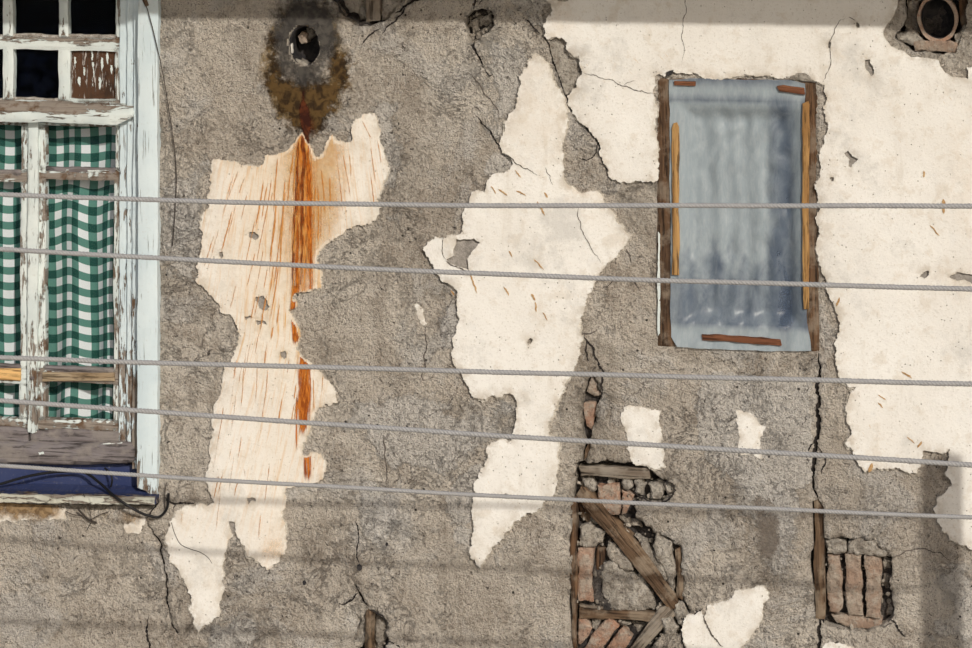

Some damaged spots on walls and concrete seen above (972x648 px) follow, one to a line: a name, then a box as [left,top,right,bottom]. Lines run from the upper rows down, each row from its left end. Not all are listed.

spalling [338,0,404,25]
rust [234,135,351,414]
flaking render [423,0,972,569]
flaking render [163,112,390,633]
rust [279,357,323,446]
crack [808,353,826,497]
crack [145,499,195,648]
spalling [354,608,399,648]
spalling [570,377,770,648]
crack [816,619,824,648]
spalling [812,499,895,629]